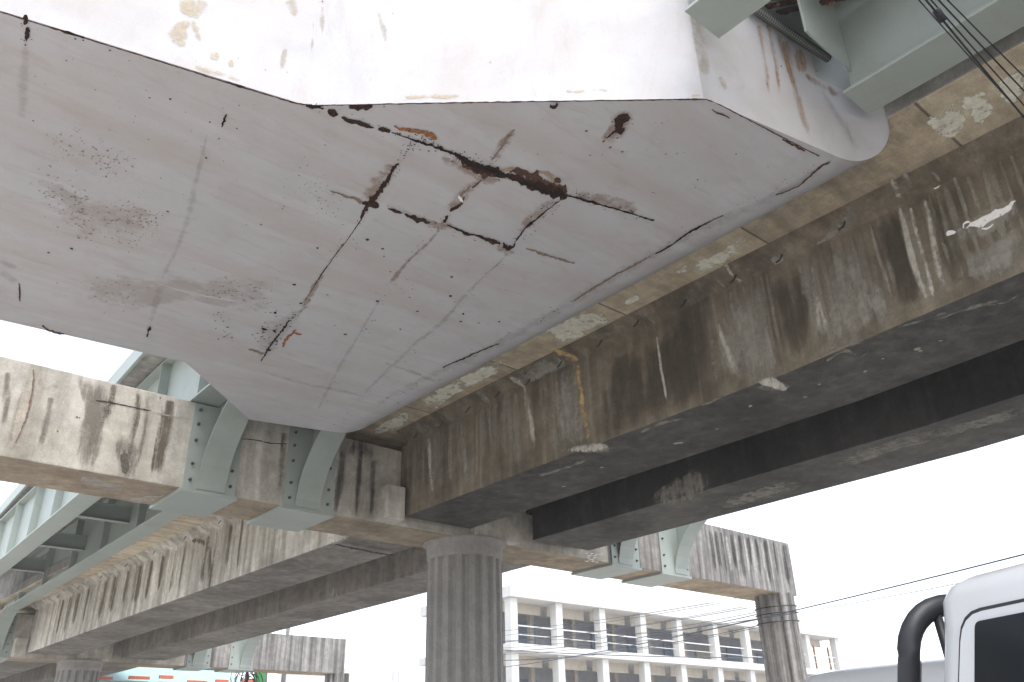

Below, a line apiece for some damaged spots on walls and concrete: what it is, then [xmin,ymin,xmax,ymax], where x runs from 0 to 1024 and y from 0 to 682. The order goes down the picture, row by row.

rust [0,11,819,173]
peeling [926,71,1024,138]
crack [305,105,654,300]
crack [573,215,723,301]
crack [776,162,830,196]
water stain [771,172,957,343]
spalling [946,199,1015,238]
rust [206,271,316,361]
peeling [545,311,608,343]
water stain [81,385,115,459]
water stain [133,395,174,469]
rust [571,365,607,452]